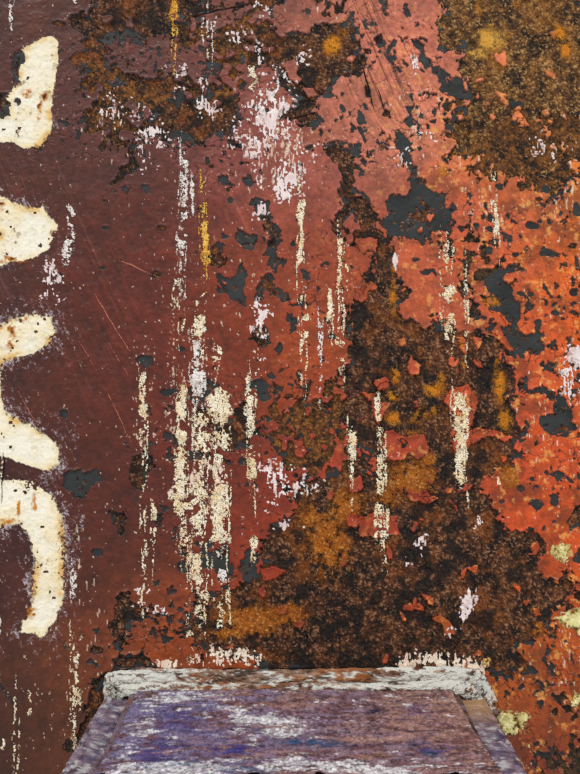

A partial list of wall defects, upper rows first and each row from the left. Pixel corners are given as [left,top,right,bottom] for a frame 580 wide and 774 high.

rust [467,29,505,58]
rust [554,23,570,58]
peeling [53,0,396,191]
peeling [411,0,580,206]
peeling [108,106,580,677]
rust [424,374,445,396]
rust [494,359,512,429]
rust [299,453,439,579]
rust [206,602,311,639]
peeling [65,675,105,753]
peeling [546,681,579,722]
peeling [533,735,580,774]